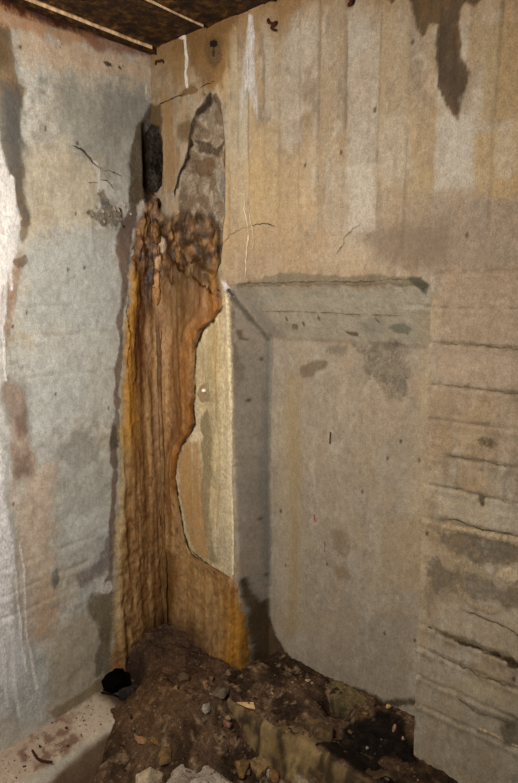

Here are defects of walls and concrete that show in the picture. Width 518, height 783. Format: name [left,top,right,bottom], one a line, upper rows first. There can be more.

leakage [410,0,478,115]
leakage [0,24,29,381]
crack [74,146,121,192]
peeling [86,190,132,227]
spalling [143,104,163,209]
spalling [174,93,225,272]
leakage [0,104,152,721]
leakage [176,200,429,661]
crack [428,626,518,686]